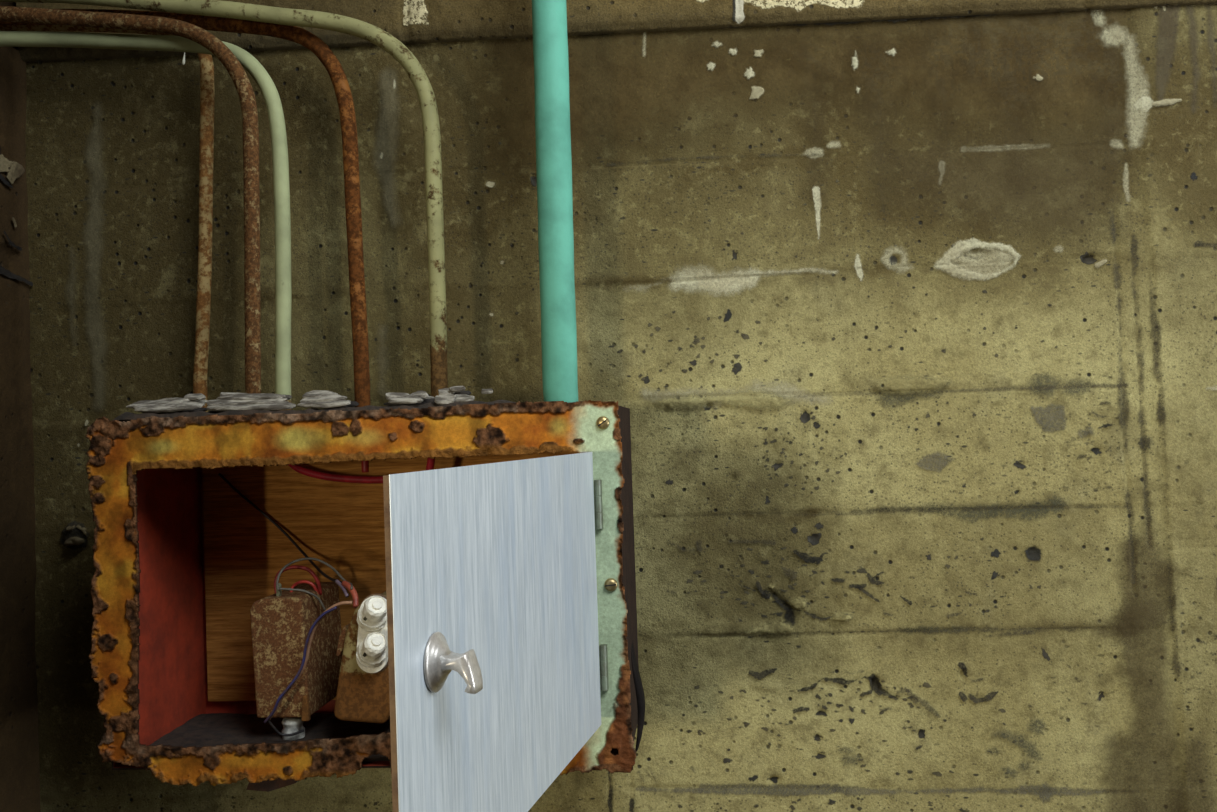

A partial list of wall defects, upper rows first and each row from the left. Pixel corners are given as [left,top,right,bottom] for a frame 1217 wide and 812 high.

peeling [403,0,429,26]
peeling [743,0,865,12]
damp [935,239,1020,280]
damp [838,498,1063,521]